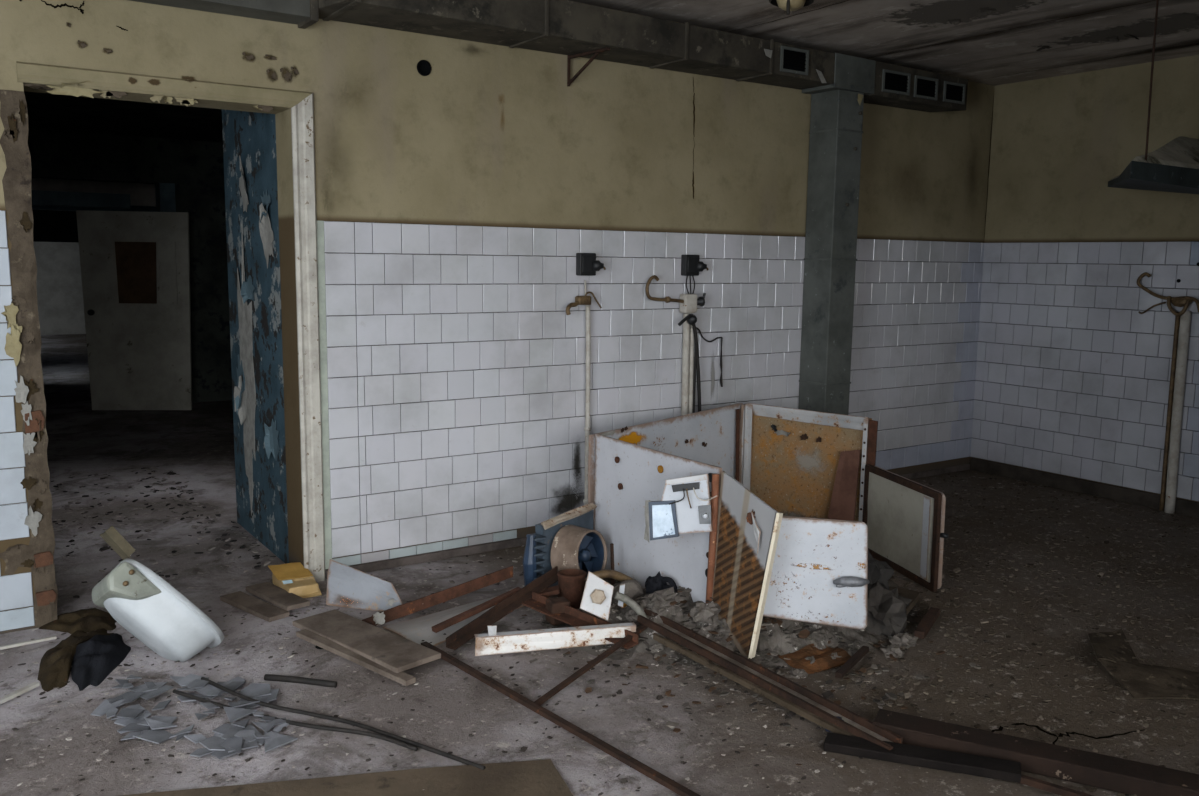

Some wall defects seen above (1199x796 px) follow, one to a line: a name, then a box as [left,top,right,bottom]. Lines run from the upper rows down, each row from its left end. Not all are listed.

peeling [150,95,198,106]
spalling [242,52,299,81]
peeling [239,158,274,268]
spalling [0,81,128,628]
peeling [234,235,279,516]
crack [991,723,1145,745]